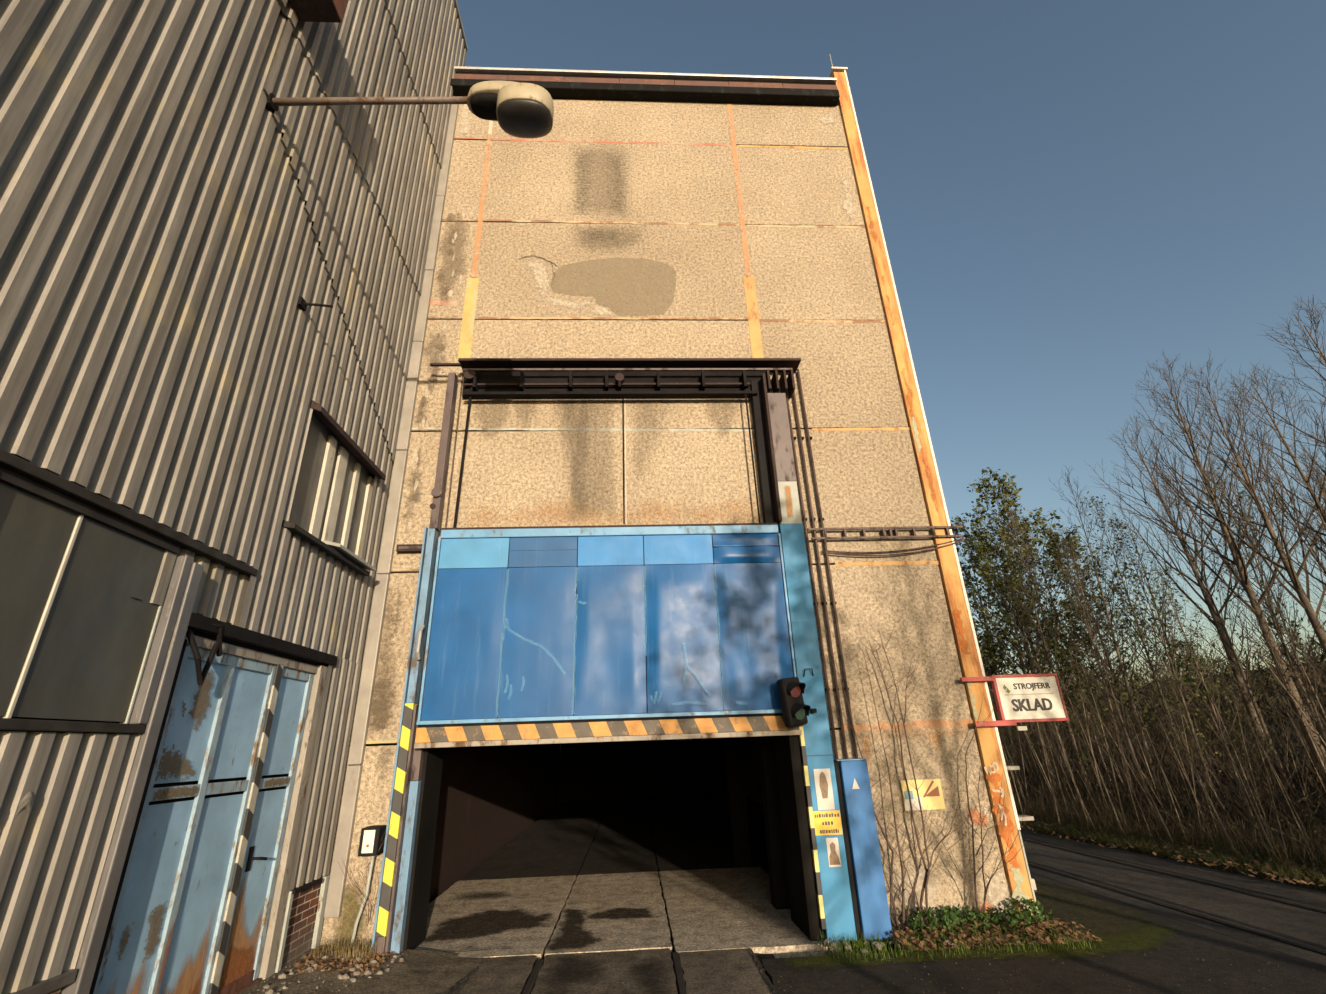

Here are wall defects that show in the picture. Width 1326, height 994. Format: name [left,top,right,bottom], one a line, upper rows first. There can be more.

spalling [527,260,611,316]
corrosion [155,925,208,994]
corrosion [218,888,261,990]